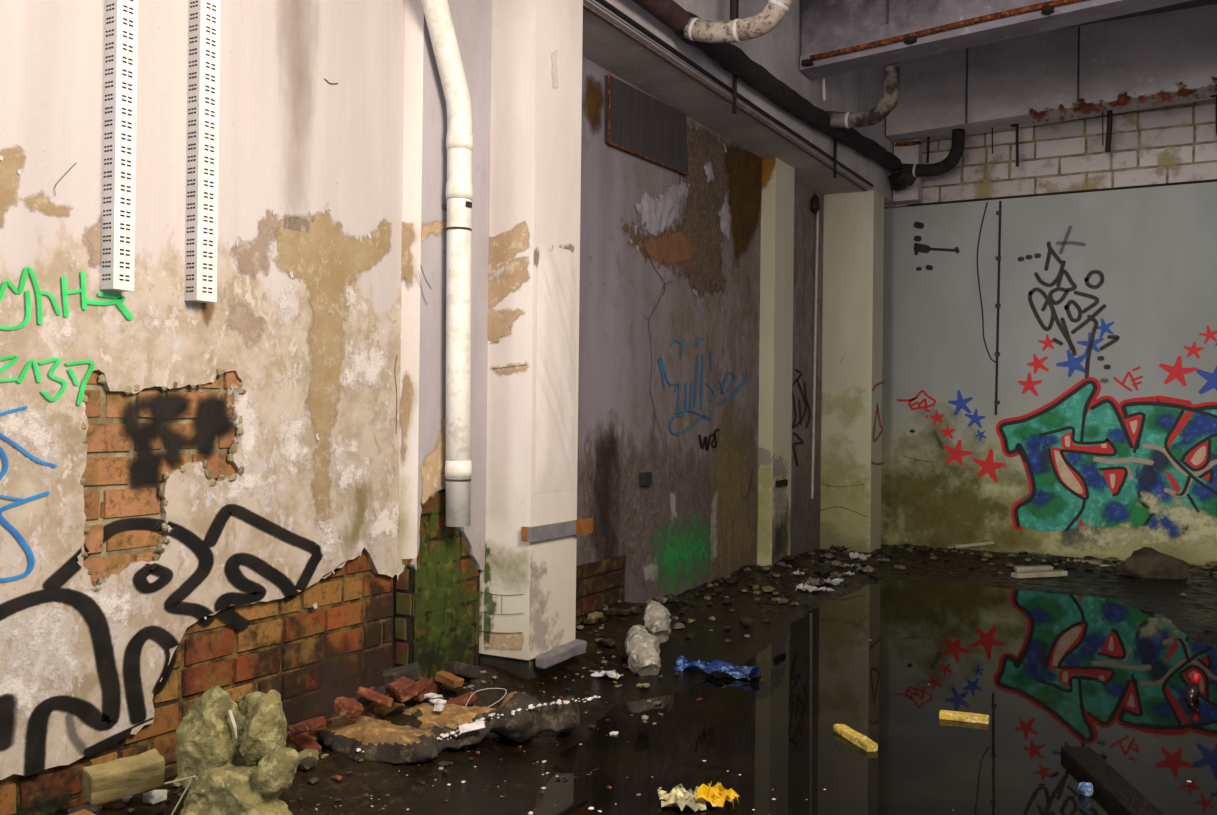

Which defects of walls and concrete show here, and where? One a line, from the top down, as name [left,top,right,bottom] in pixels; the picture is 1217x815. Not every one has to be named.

rust [1029,77,1217,122]
peeling [0,147,70,227]
peeling [84,217,102,267]
peeling [488,222,574,342]
peeling [623,122,731,298]
peeling [227,207,447,528]
peeling [492,363,528,375]
flaking render [80,367,246,593]
damp [1062,526,1100,545]
flaking render [0,410,562,815]